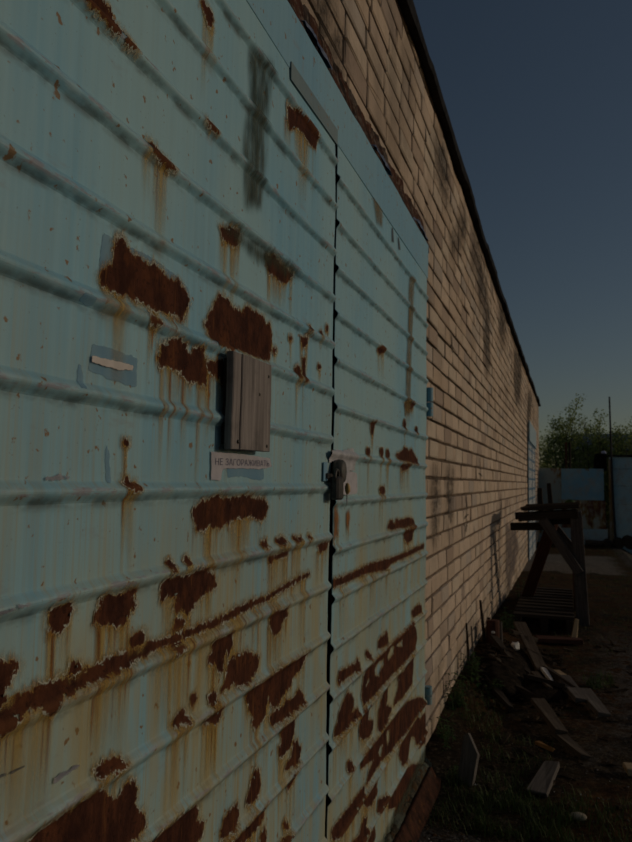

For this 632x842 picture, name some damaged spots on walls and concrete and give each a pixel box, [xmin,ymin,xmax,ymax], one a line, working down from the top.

rust [87,0,141,58]
rust [285,102,320,154]
rust [266,253,295,289]
rust [99,231,278,423]
rust [288,323,329,383]
rust [0,490,350,842]
rust [331,603,428,842]